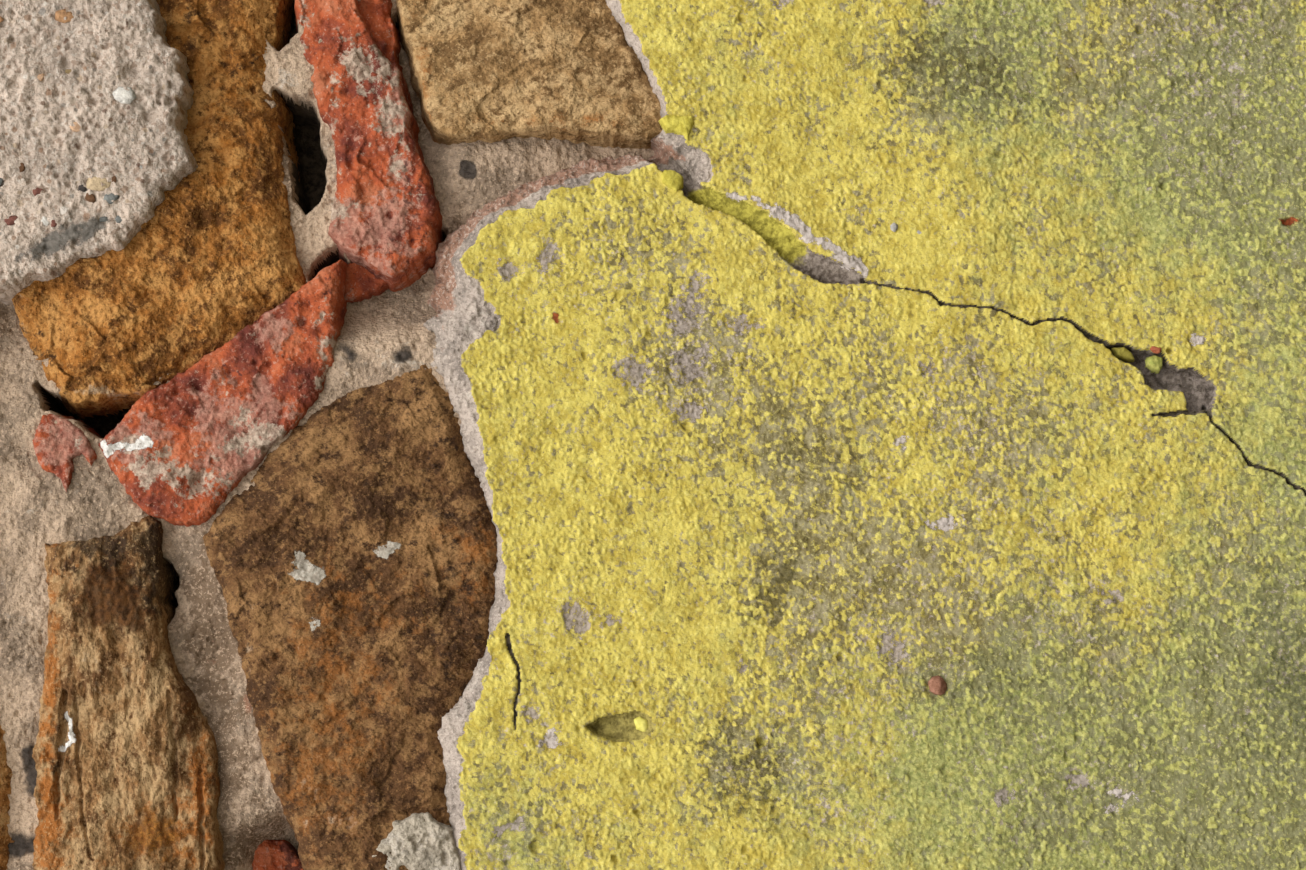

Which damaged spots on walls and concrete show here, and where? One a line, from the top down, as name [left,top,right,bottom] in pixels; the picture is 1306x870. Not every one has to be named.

crack [668,156,1111,349]
flaking render [423,0,714,870]
crack [1152,408,1306,496]
crack [505,633,522,730]